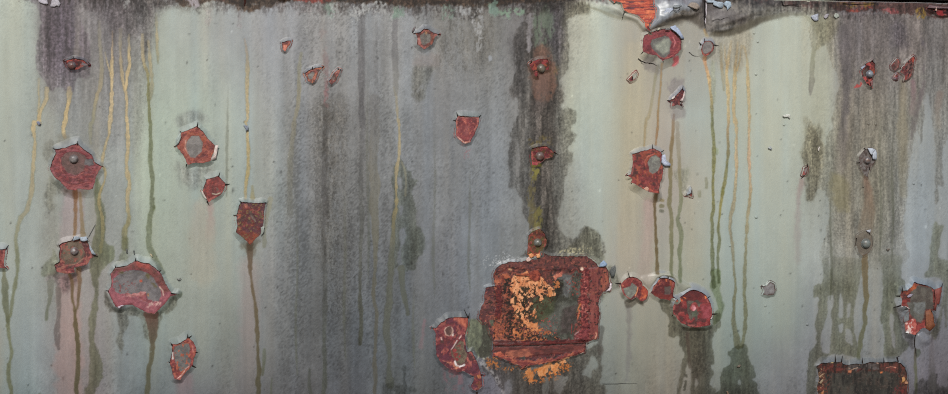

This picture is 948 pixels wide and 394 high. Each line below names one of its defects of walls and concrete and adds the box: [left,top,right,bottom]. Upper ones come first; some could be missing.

peeling [609,0,684,84]
peeling [47,136,106,199]
peeling [173,121,228,206]
peeling [233,197,269,251]
leakage [0,0,645,394]
rust [477,37,658,387]
peeling [624,144,671,203]
leakage [641,0,948,394]
peeling [104,249,182,319]
peeling [429,226,717,394]
peeling [893,275,943,352]
rust [814,361,909,394]